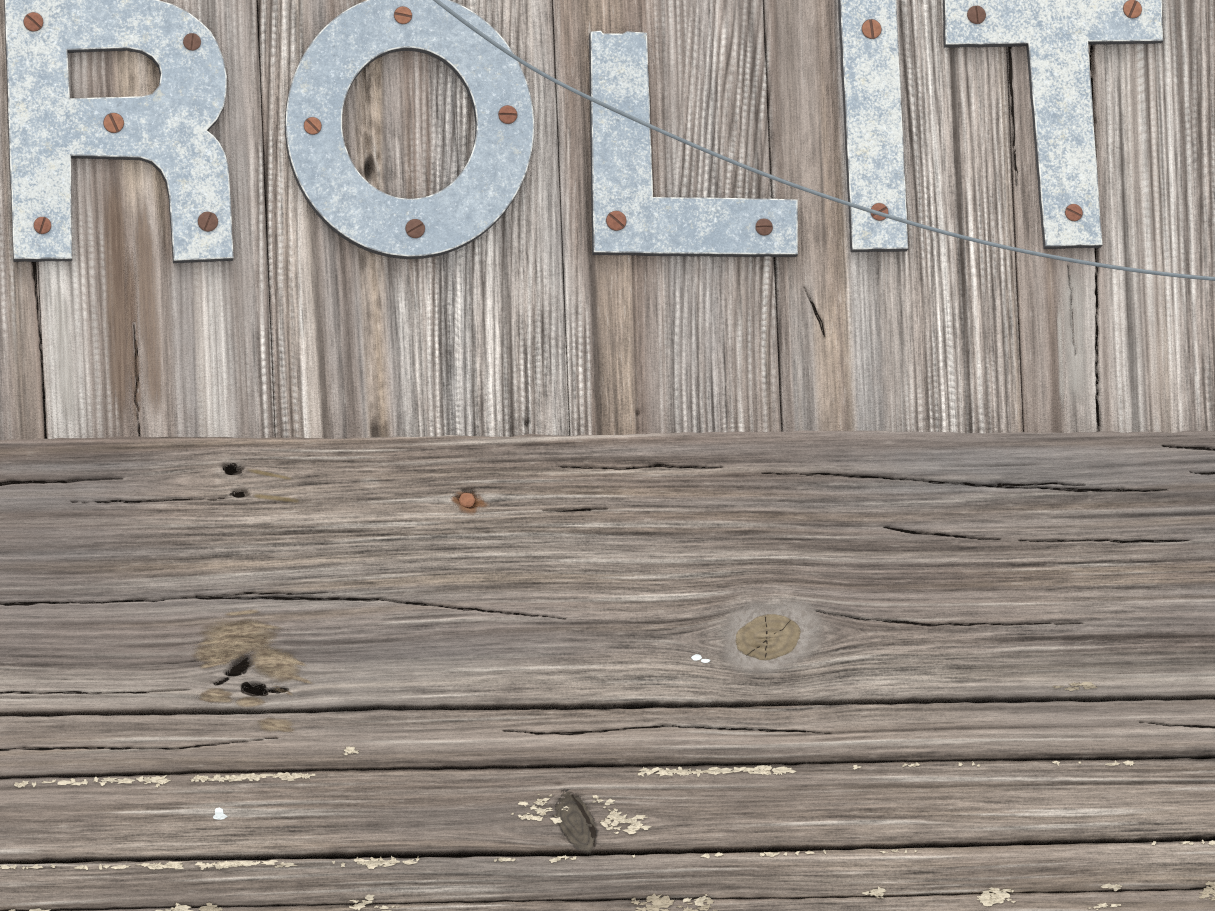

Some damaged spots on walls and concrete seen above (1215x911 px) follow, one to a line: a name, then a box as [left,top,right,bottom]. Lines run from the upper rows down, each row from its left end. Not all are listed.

crack [1087,45,1095,103]
crack [808,297,825,337]
crack [1067,248,1100,431]
corrosion [452,493,485,512]
crack [1020,537,1188,545]
crack [0,592,548,617]